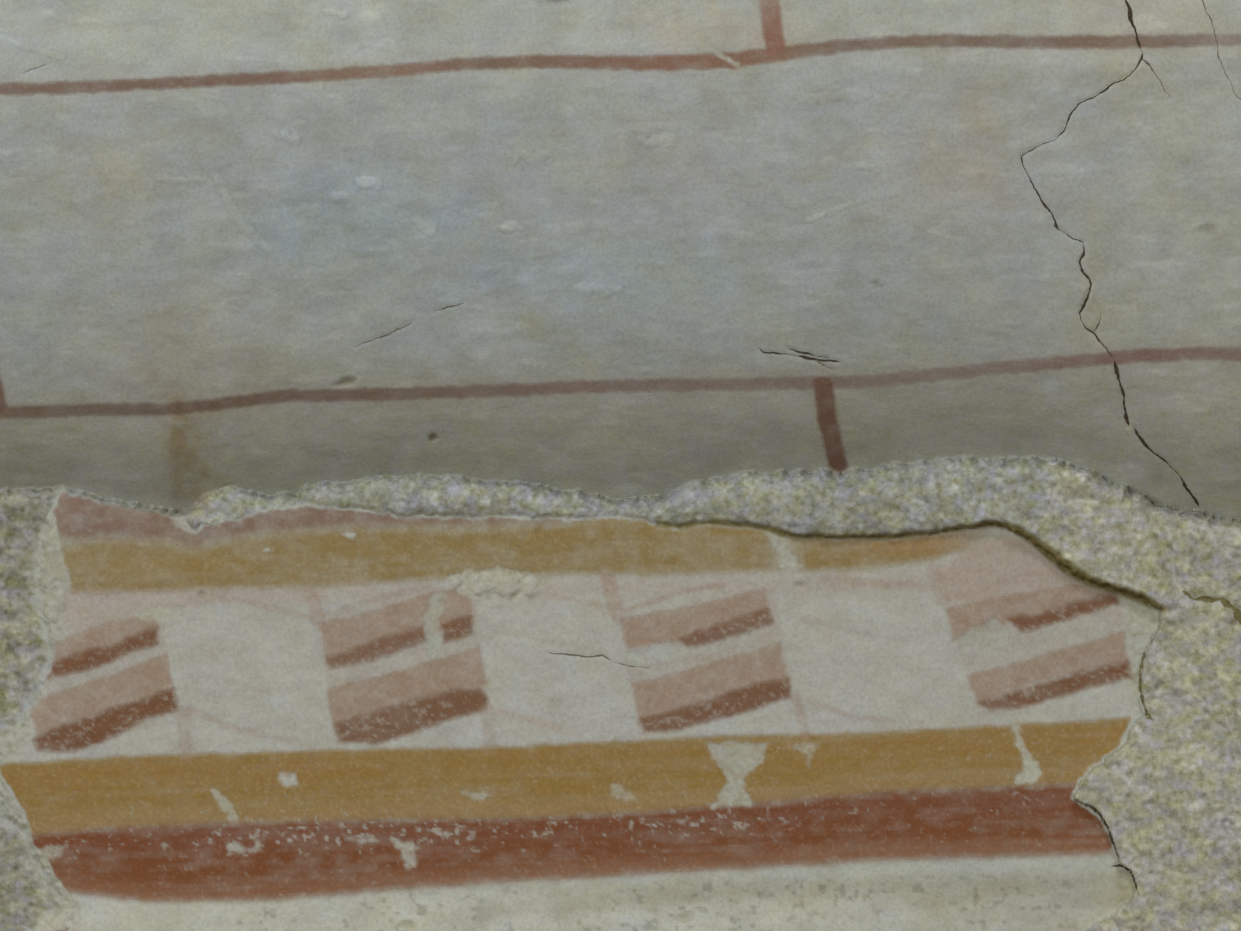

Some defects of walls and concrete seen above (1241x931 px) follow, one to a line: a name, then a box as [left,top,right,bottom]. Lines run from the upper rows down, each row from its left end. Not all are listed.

crack [1202,0,1240,99]
crack [1021,0,1199,506]
crack [759,348,840,368]
peeling [168,508,196,536]
spalling [0,485,95,737]
spalling [259,456,1241,931]
spalling [0,809,66,931]
peeling [211,788,240,821]
peeling [226,838,262,854]